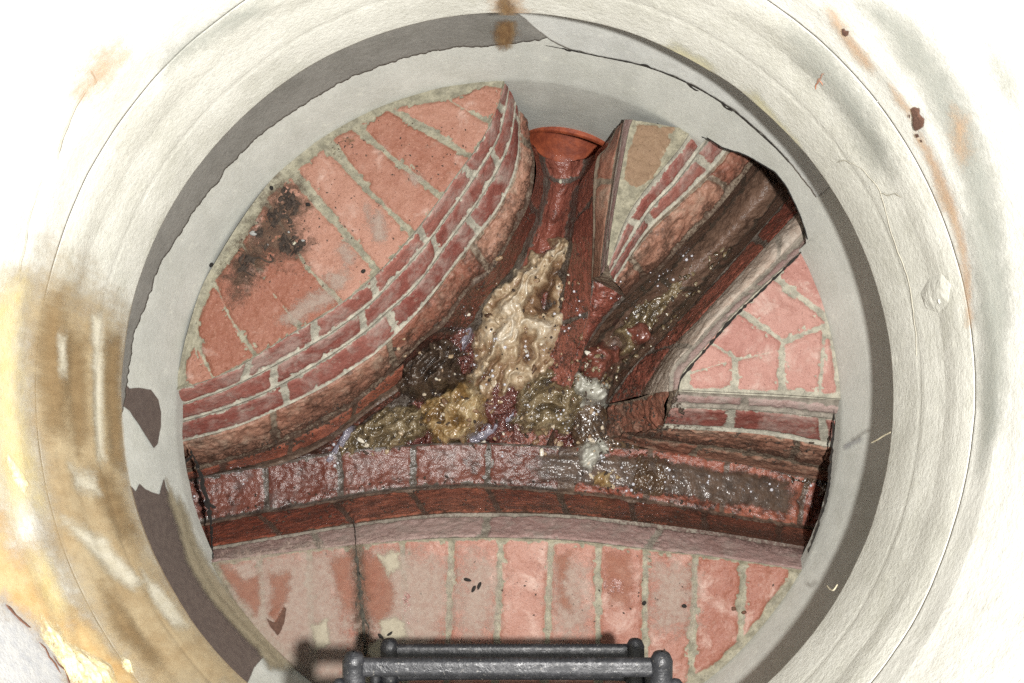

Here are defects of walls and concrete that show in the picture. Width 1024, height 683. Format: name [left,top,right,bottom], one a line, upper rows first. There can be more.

rust [494,0,518,49]
water stain [7,274,292,683]
crack [348,516,373,657]